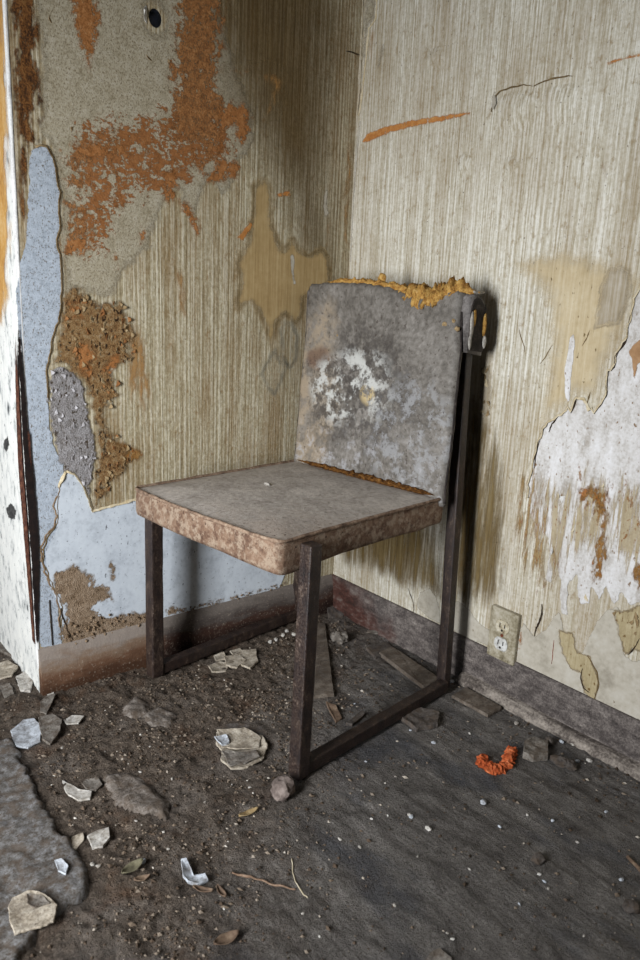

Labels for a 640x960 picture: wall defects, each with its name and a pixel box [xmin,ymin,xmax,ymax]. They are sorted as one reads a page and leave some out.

rust [363,113,470,142]
crack [491,75,570,112]
peeling [15,0,253,647]
water stain [235,181,332,339]
crack [15,327,73,646]
peeling [163,527,286,618]
peeling [516,285,640,720]